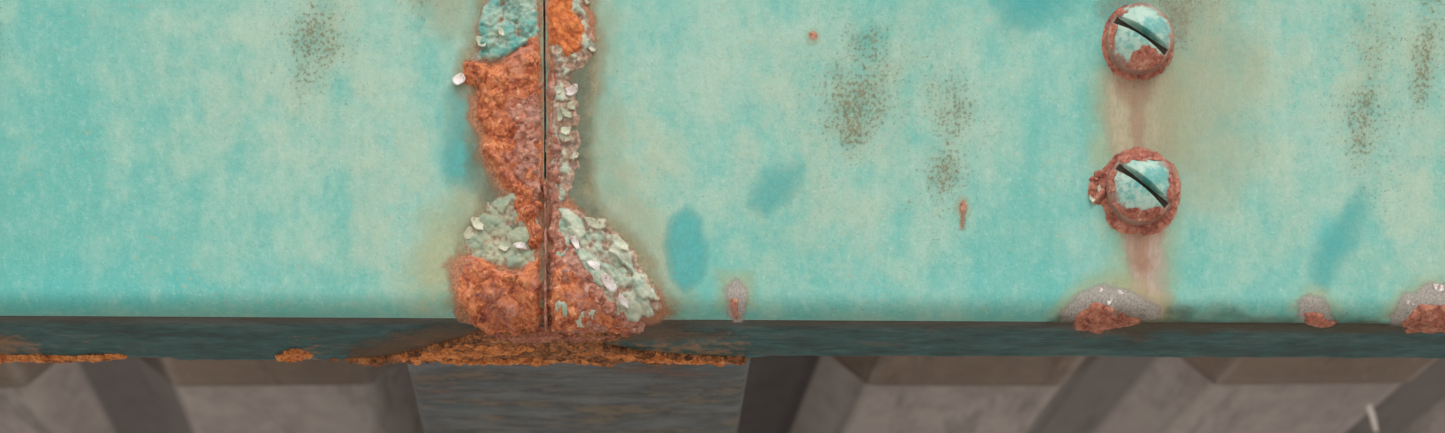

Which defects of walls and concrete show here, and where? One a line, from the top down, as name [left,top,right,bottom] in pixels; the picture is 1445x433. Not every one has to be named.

corrosion [1059,4,1181,334]